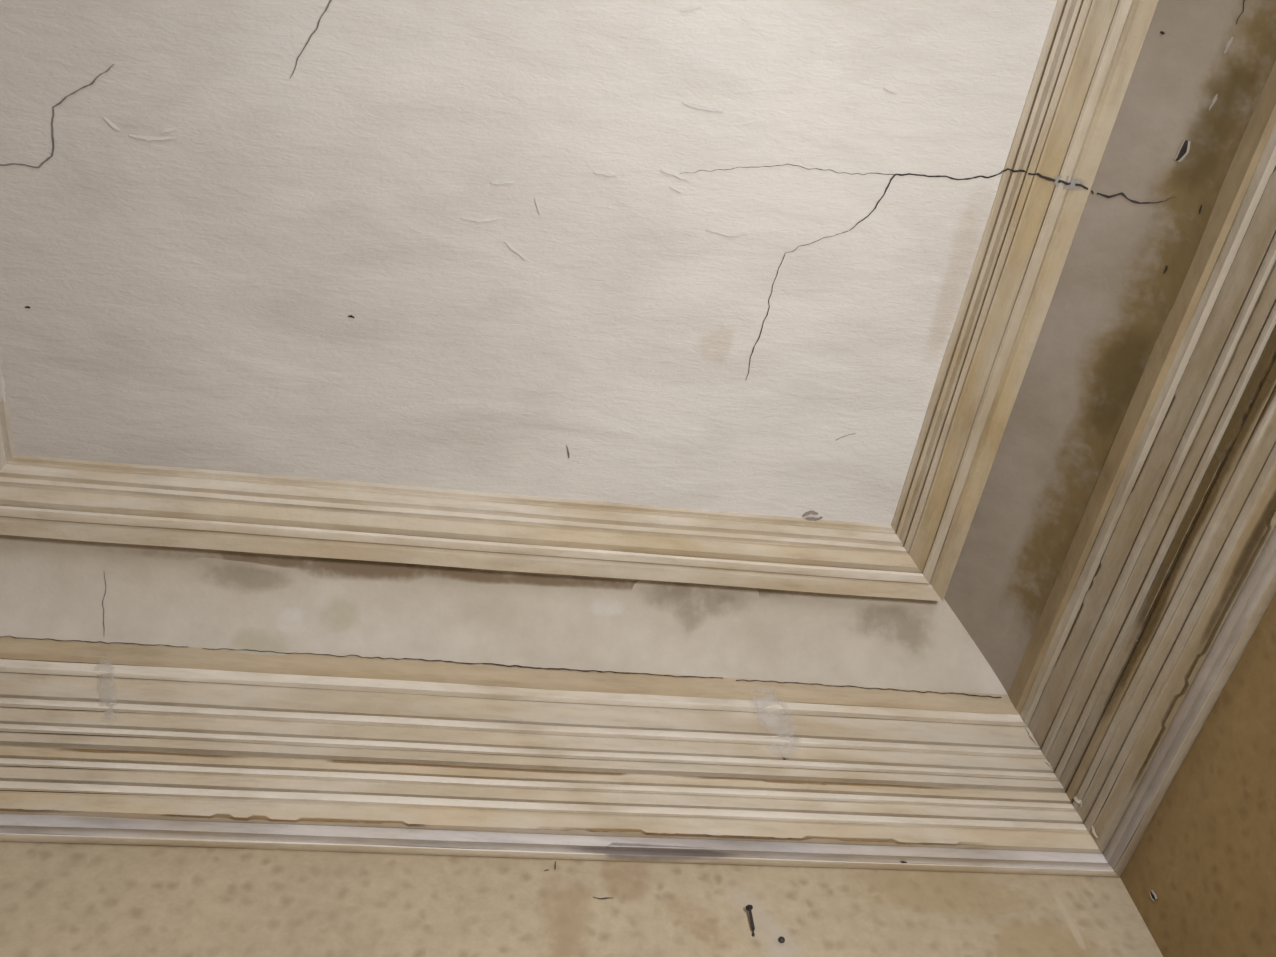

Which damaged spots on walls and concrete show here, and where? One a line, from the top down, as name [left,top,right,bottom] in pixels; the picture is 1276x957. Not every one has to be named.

crack [0,64,114,168]
crack [290,0,332,78]
flaking render [1173,140,1191,162]
crack [680,164,1174,379]
damp [995,0,1276,683]
damp [1137,493,1276,777]